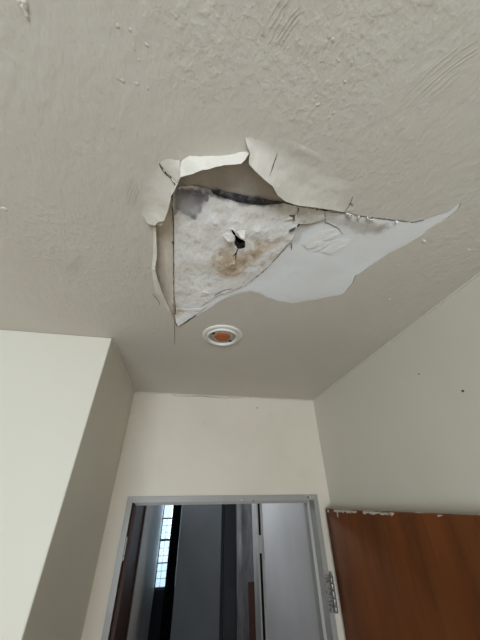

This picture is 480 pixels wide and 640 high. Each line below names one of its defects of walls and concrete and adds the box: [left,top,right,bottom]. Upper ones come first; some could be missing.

crack [156,208,174,305]
spalling [152,151,459,326]